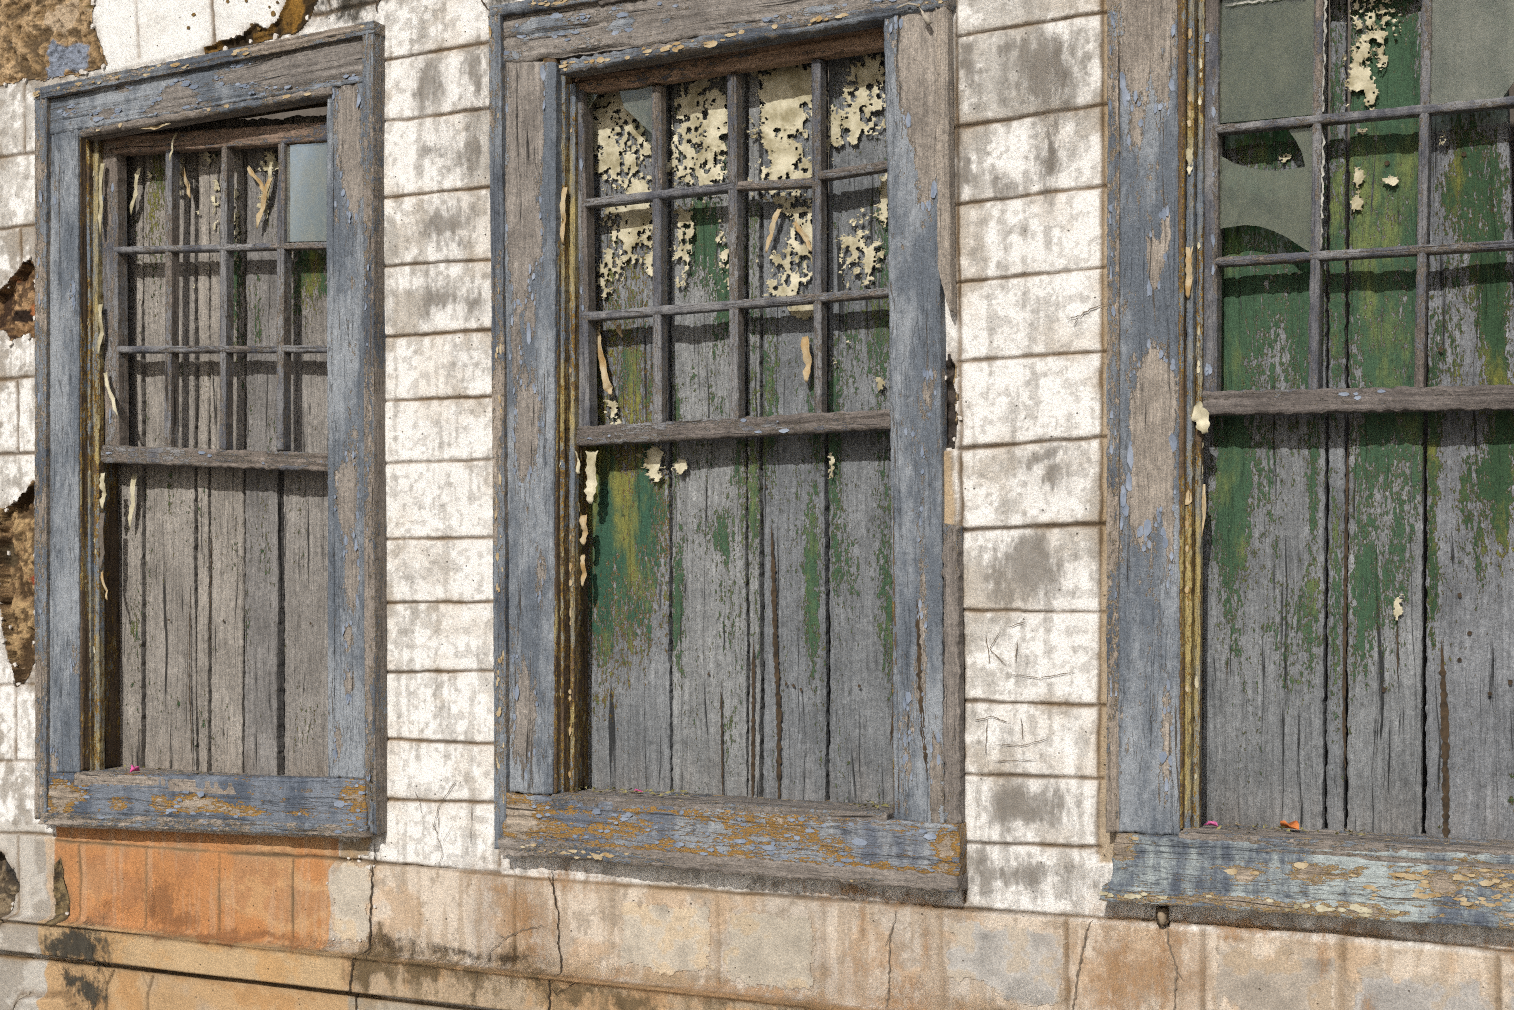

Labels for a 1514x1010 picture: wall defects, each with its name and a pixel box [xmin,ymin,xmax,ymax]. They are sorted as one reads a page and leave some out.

spalling [0,0,371,115]
leakage [960,42,974,85]
leakage [999,33,1073,106]
peeling [57,104,122,131]
spalling [0,256,41,346]
spalling [0,480,42,687]
leakage [40,901,110,1010]
leakage [147,884,334,949]